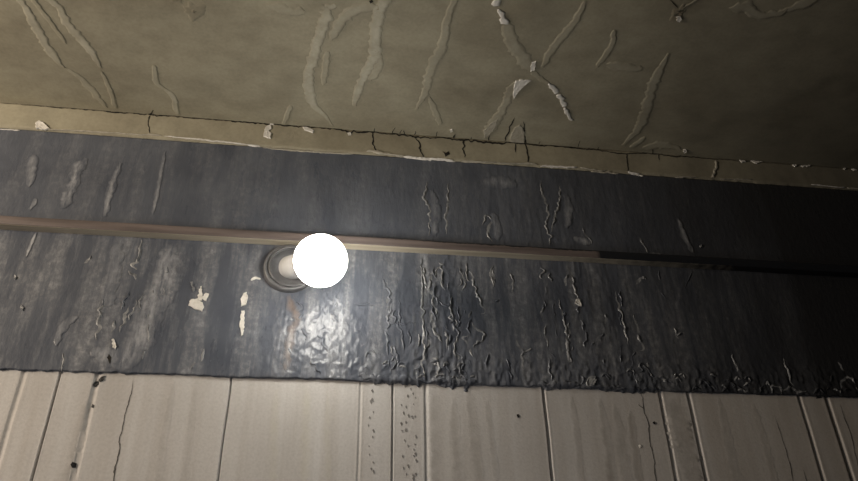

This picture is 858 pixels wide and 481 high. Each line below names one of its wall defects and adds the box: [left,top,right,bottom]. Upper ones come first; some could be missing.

water stain [16,0,117,108]
flaking render [35,120,350,155]
water stain [302,0,392,126]
crack [4,103,751,178]
flaking render [366,0,643,177]
peeling [90,240,209,387]
peeling [239,292,248,336]
crack [113,383,133,481]
crack [638,395,657,481]